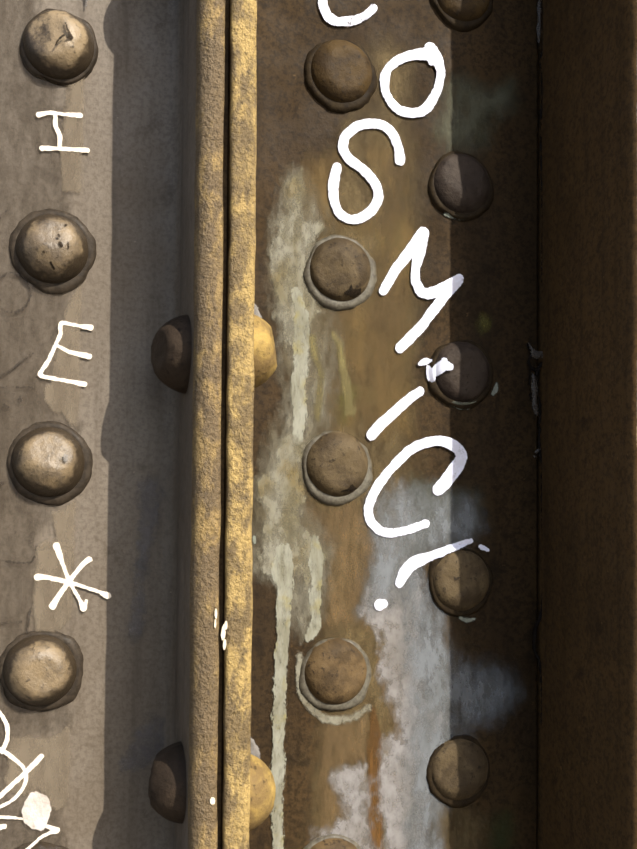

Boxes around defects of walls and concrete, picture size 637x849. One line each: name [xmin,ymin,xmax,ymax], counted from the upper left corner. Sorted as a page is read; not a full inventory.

rust [300,159,331,219]
rust [326,148,413,424]
water stain [253,50,512,849]
rust [304,503,380,630]
rust [432,616,456,685]
rust [319,708,383,849]